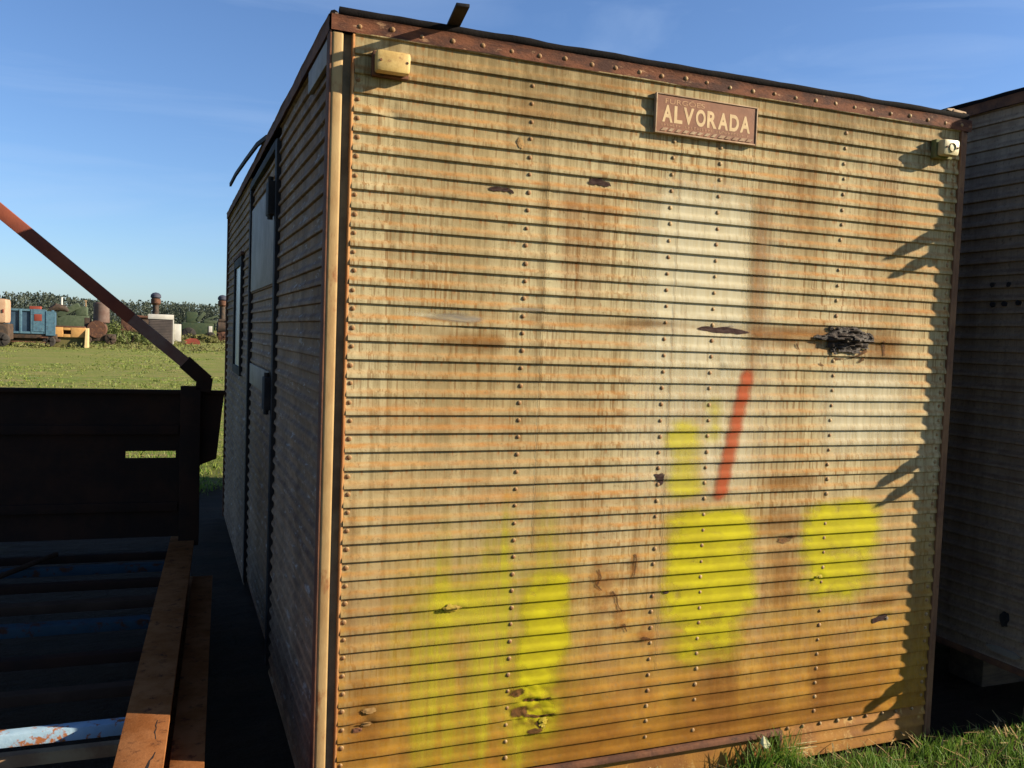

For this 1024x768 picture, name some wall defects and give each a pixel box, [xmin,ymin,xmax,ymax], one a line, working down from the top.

peeling [588,178,611,187]
peeling [698,326,749,334]
peeling [814,326,841,354]